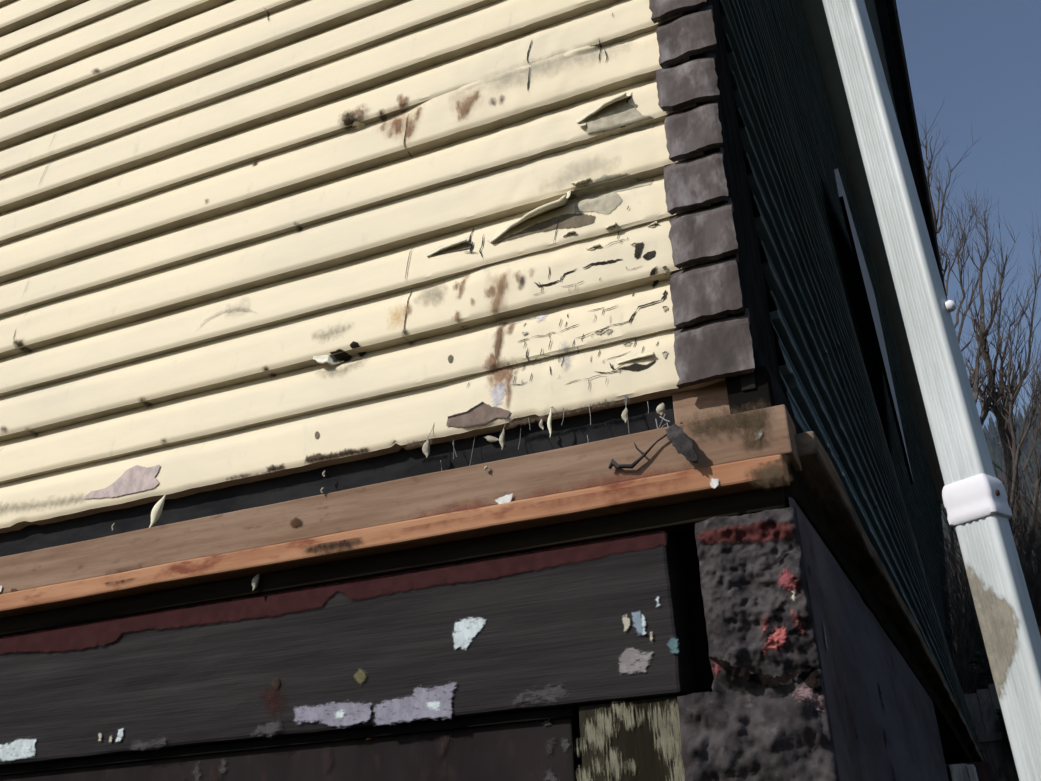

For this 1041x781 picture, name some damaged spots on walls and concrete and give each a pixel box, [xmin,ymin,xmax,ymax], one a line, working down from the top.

corrosion [379,95,421,157]
corrosion [457,92,478,120]
peeling [576,92,656,136]
peeling [426,174,653,258]
corrosion [487,274,524,312]
crack [508,232,667,389]
peeling [313,341,366,373]
corrosion [484,322,514,405]
spalling [446,383,630,428]
spalling [0,465,166,528]
spalling [619,612,653,674]
spalling [293,682,456,727]